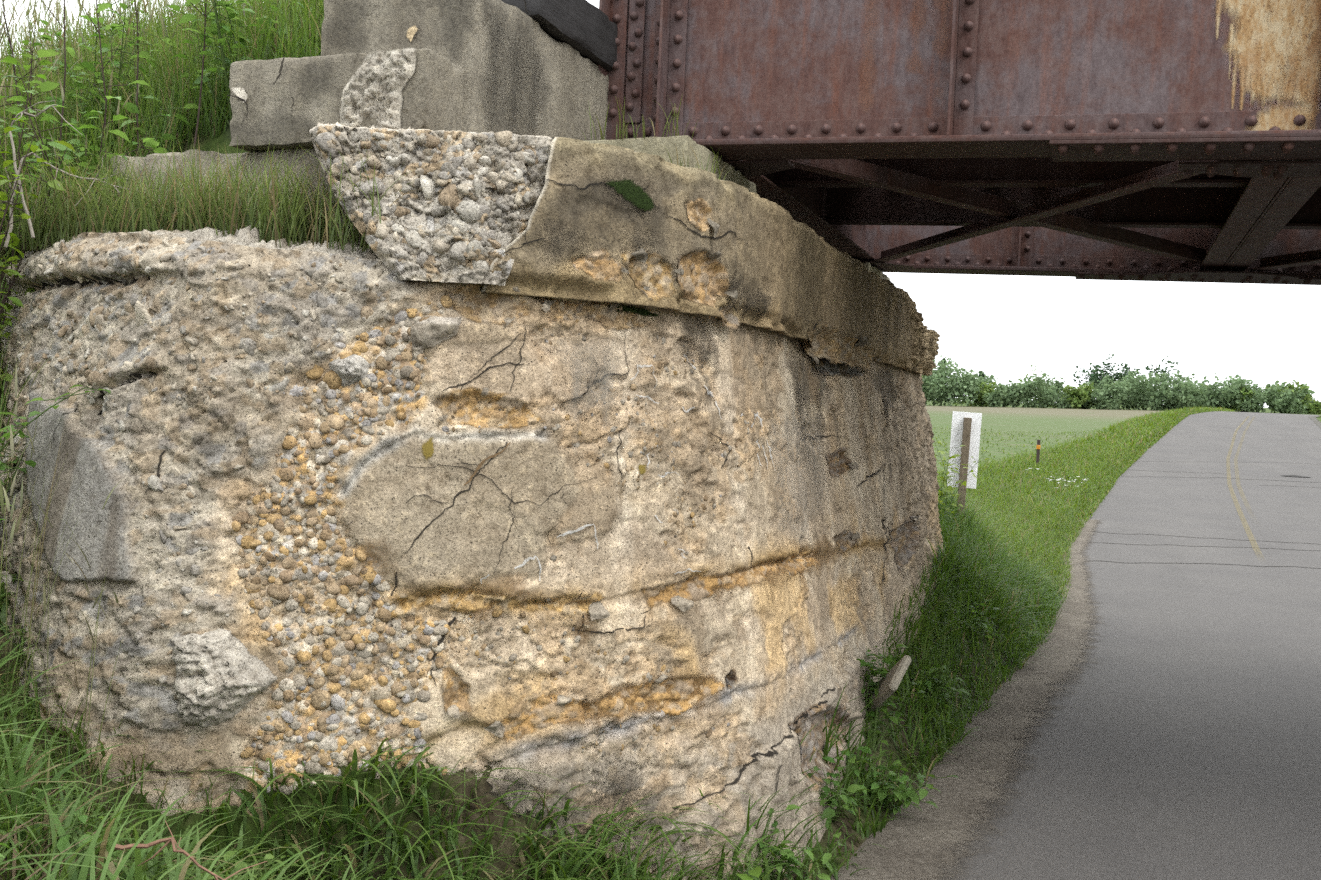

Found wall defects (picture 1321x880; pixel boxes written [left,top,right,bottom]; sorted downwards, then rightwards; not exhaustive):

corrosion [1216,0,1321,131]
spalling [309,26,646,350]
spalling [572,198,742,329]
crack [391,428,624,596]
crack [674,688,836,810]